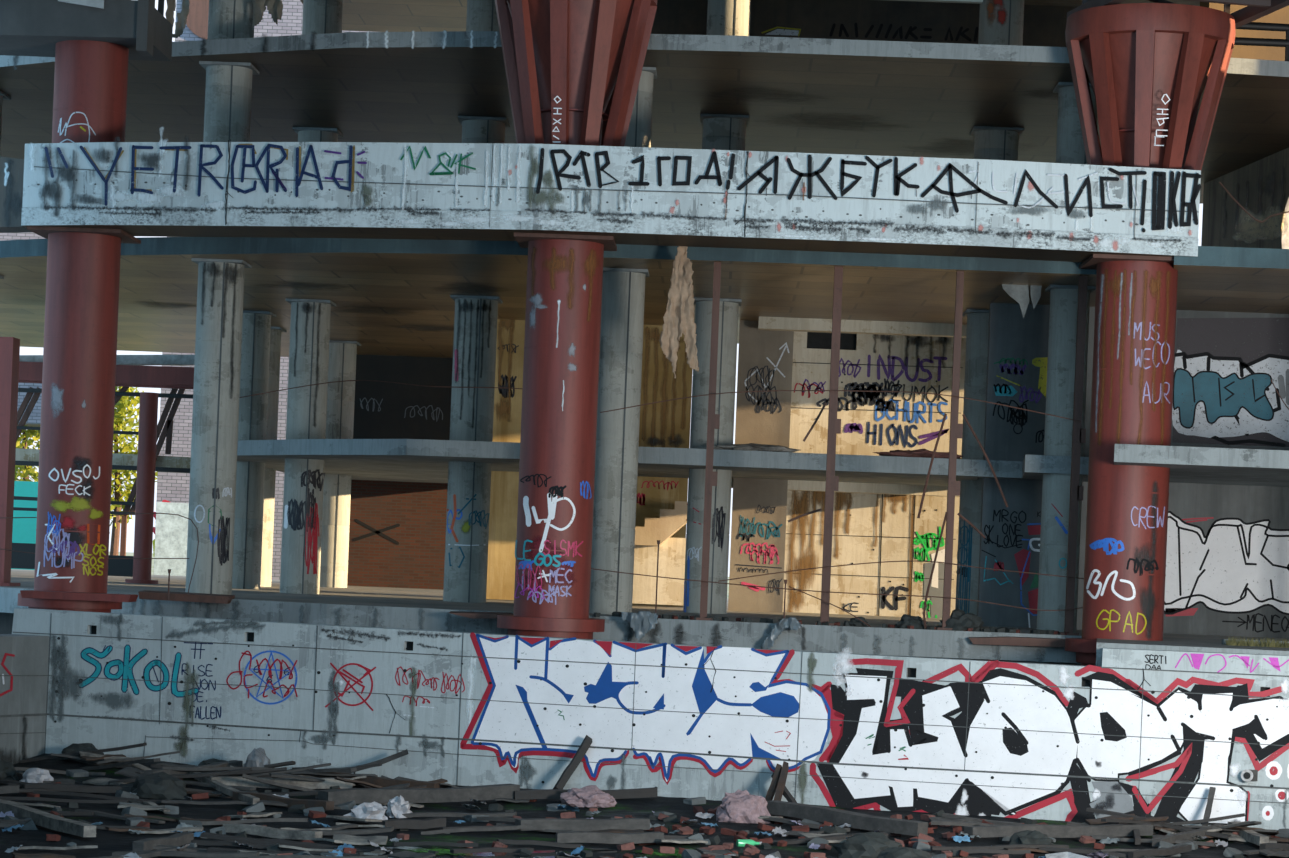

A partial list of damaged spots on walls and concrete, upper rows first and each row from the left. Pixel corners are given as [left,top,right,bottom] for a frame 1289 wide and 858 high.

damp [4,160,22,227]
damp [30,127,190,219]
damp [155,263,237,393]
damp [289,283,326,426]
damp [405,285,491,428]